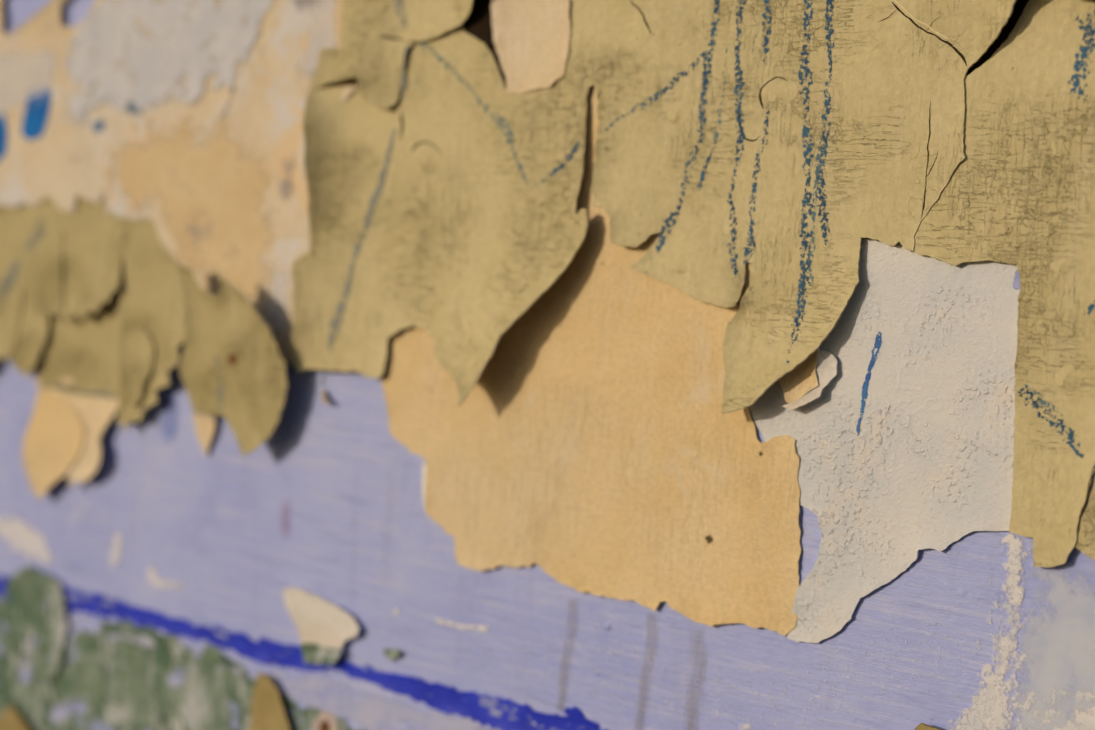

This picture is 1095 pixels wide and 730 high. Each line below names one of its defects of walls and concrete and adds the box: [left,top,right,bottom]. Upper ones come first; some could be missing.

crack [878,0,967,66]
crack [921,100,938,217]
peeling [0,0,1016,500]
peeling [380,0,1095,643]
peeling [0,704,30,730]
peeling [0,566,68,685]
peeling [249,673,291,730]
peeling [283,587,360,665]
peeling [384,649,401,661]
efflorescence [947,534,1095,730]